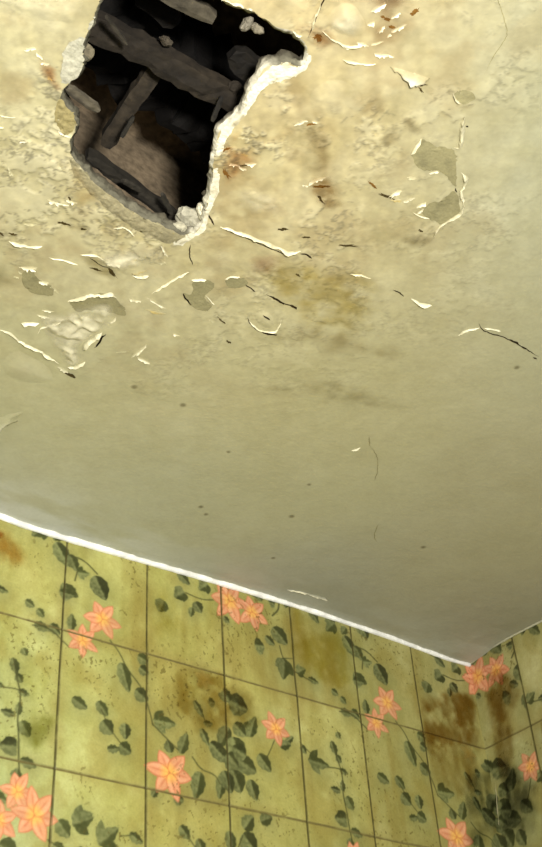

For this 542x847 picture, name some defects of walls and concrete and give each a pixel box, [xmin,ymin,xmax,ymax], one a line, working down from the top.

flaking render [48,0,430,265]
peeling [368,117,469,238]
peeling [82,254,148,279]
crack [394,290,432,308]
crack [458,327,539,359]